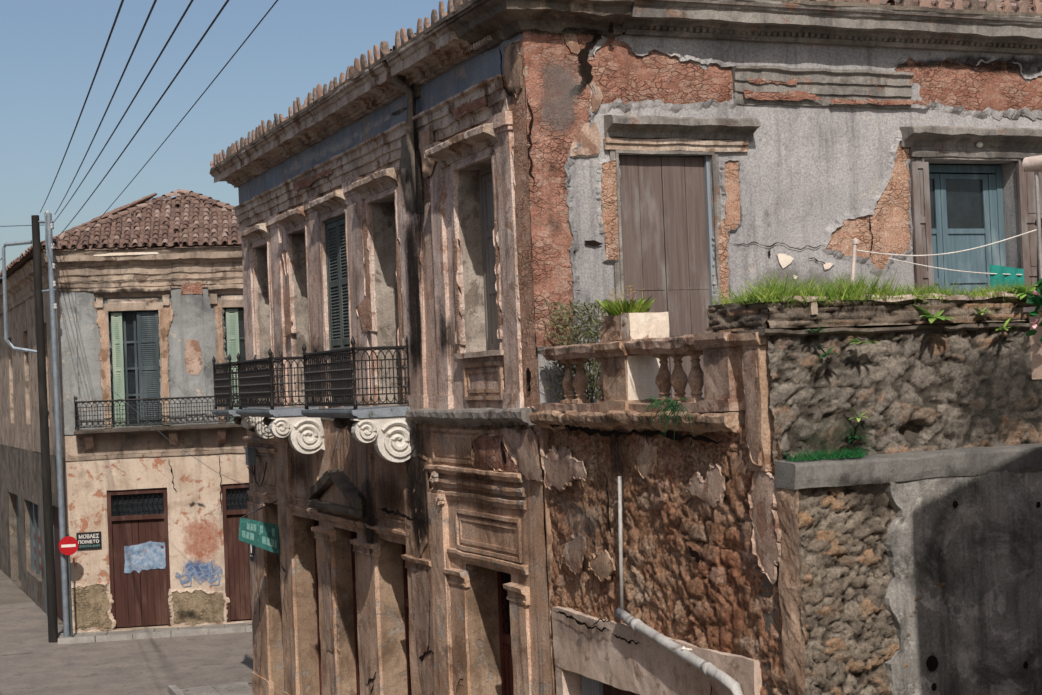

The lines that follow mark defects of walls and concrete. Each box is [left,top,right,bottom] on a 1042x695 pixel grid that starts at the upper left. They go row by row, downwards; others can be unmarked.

crack [498,45,535,189]
flaking render [889,52,1042,121]
flaking render [447,0,738,412]
flaking render [712,158,743,305]
crack [729,242,825,264]
flaking render [821,130,915,278]
flaking render [472,425,587,492]
flaking render [69,581,116,631]
flaking render [168,587,230,626]
crack [554,611,641,645]